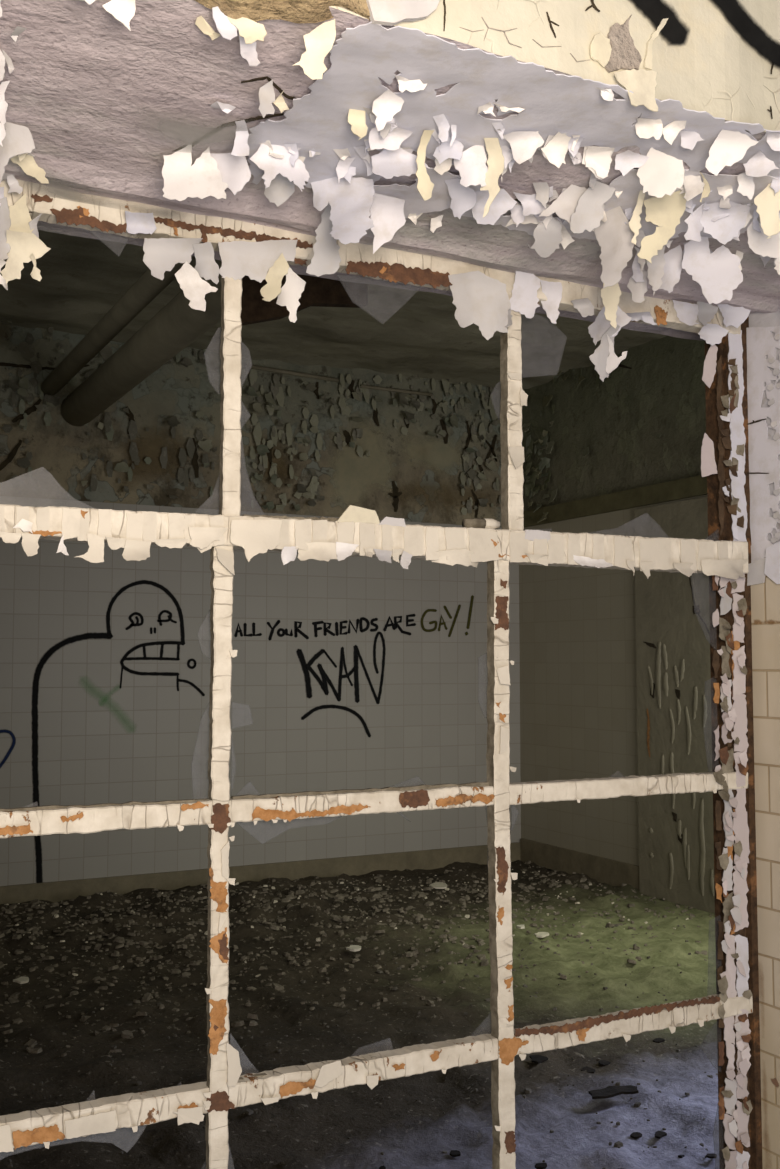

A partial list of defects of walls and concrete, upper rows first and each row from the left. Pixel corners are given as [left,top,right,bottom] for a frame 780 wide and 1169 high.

crack [585,0,600,12]
crack [443,0,587,62]
rust [31,194,137,234]
rust [154,217,313,265]
rust [345,261,453,289]
peeling [0,0,780,675]
peeling [207,822,236,885]
peeling [712,673,753,1169]
rust [498,996,720,1065]
peeling [65,1110,116,1139]
peeling [174,1092,211,1125]
rust [177,1091,236,1113]